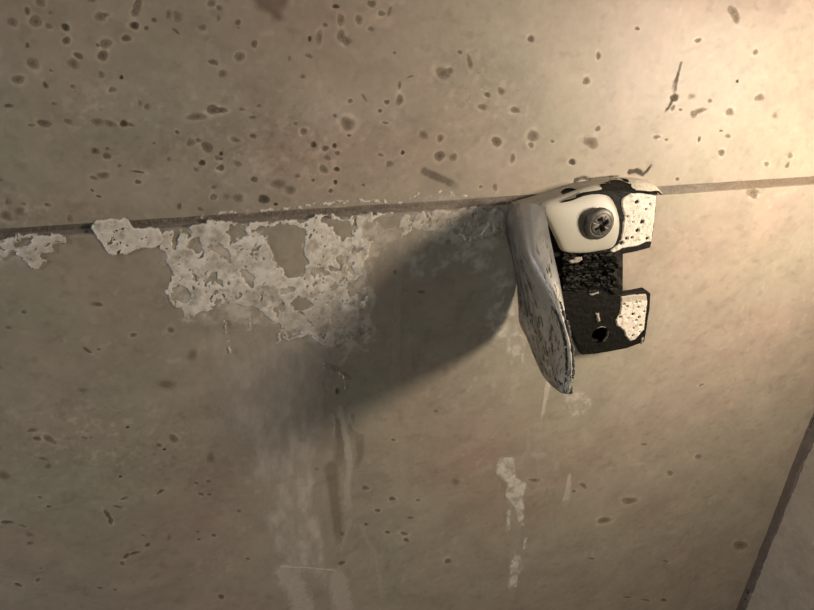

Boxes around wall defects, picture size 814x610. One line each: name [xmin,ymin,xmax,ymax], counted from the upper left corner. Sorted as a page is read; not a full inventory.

spalling [122,0,156,41]
spalling [333,4,351,45]
spalling [96,40,111,60]
spalling [92,119,134,127]
spalling [189,105,227,120]
spalling [333,114,353,137]
spalling [187,138,224,172]
spalling [311,142,339,193]
spalling [259,195,290,212]
water stain [213,332,353,610]